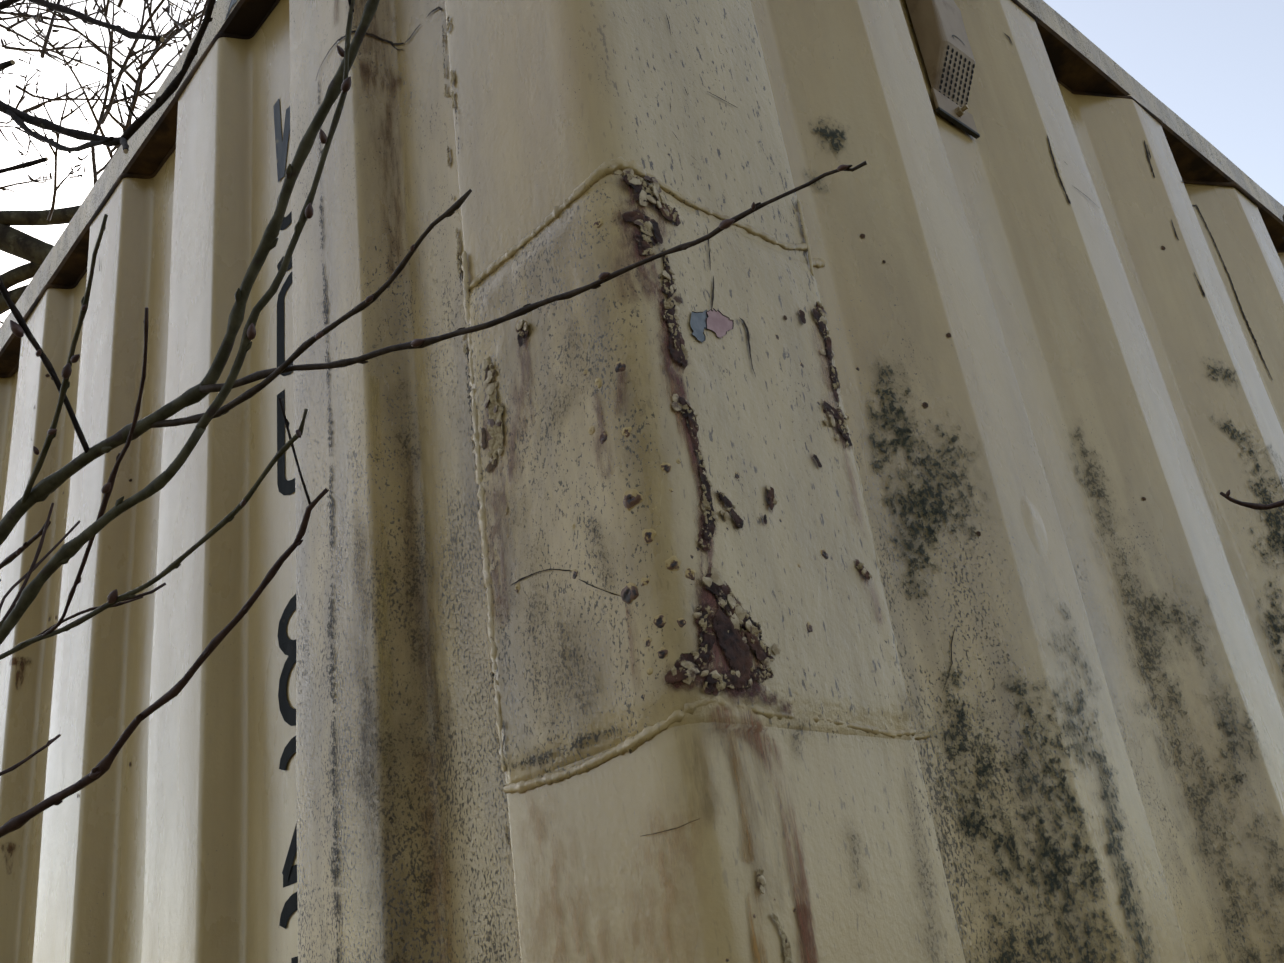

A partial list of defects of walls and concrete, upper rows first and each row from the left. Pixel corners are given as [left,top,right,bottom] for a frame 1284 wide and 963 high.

crack [316,7,442,78]
peeling [690,308,734,342]
water stain [1207,358,1238,385]
corrosion [588,168,791,862]
water stain [867,362,985,599]
water stain [322,264,340,963]
water stain [355,666,395,851]
water stain [527,585,596,714]
water stain [929,603,1154,963]
water stain [1075,416,1284,963]
corrosion [785,810,817,963]